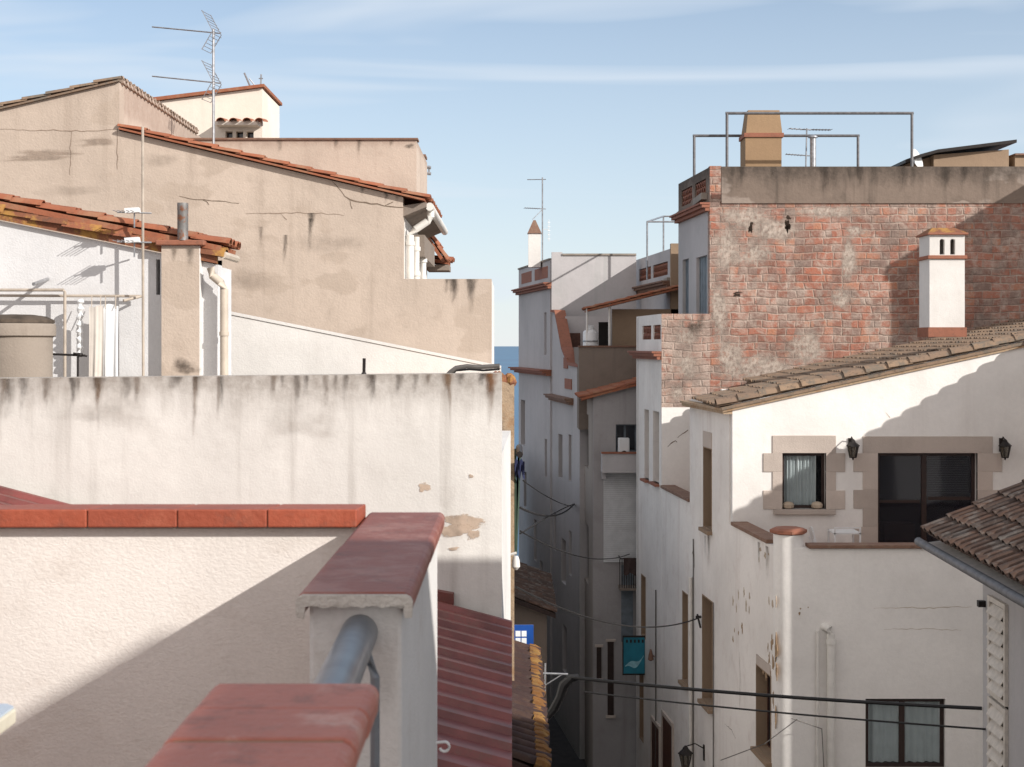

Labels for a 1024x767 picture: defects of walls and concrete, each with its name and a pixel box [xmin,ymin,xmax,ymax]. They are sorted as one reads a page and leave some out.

crack [13,129,118,172]
crack [180,181,404,220]
peeling [442,514,485,551]
peeling [762,632,778,729]